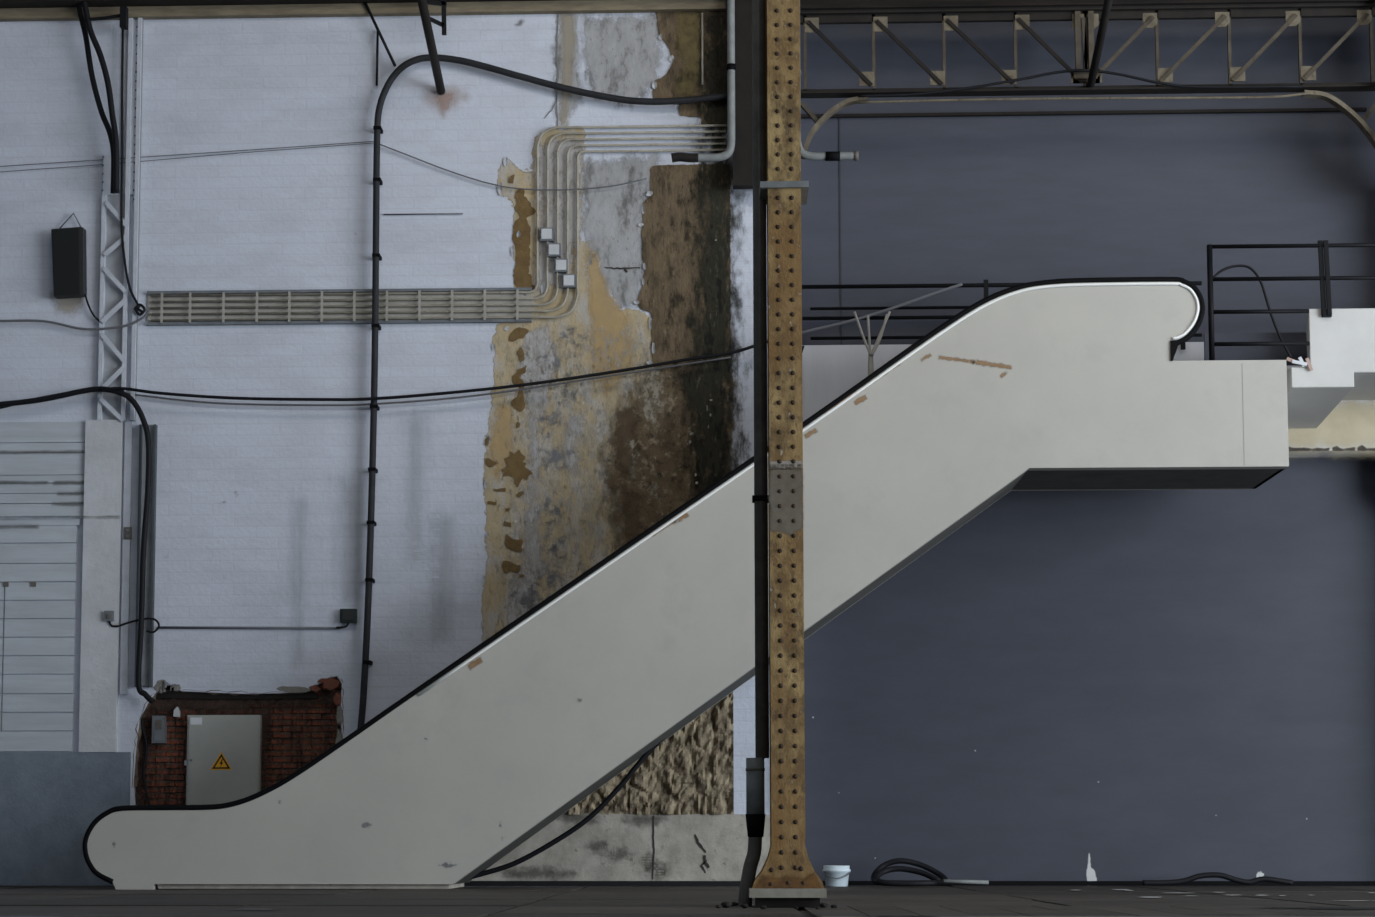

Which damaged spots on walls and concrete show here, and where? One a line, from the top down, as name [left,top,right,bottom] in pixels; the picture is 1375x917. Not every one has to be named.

spalling [652,11,727,124]
peeling [480,128,731,642]
corrosion [756,873,821,889]